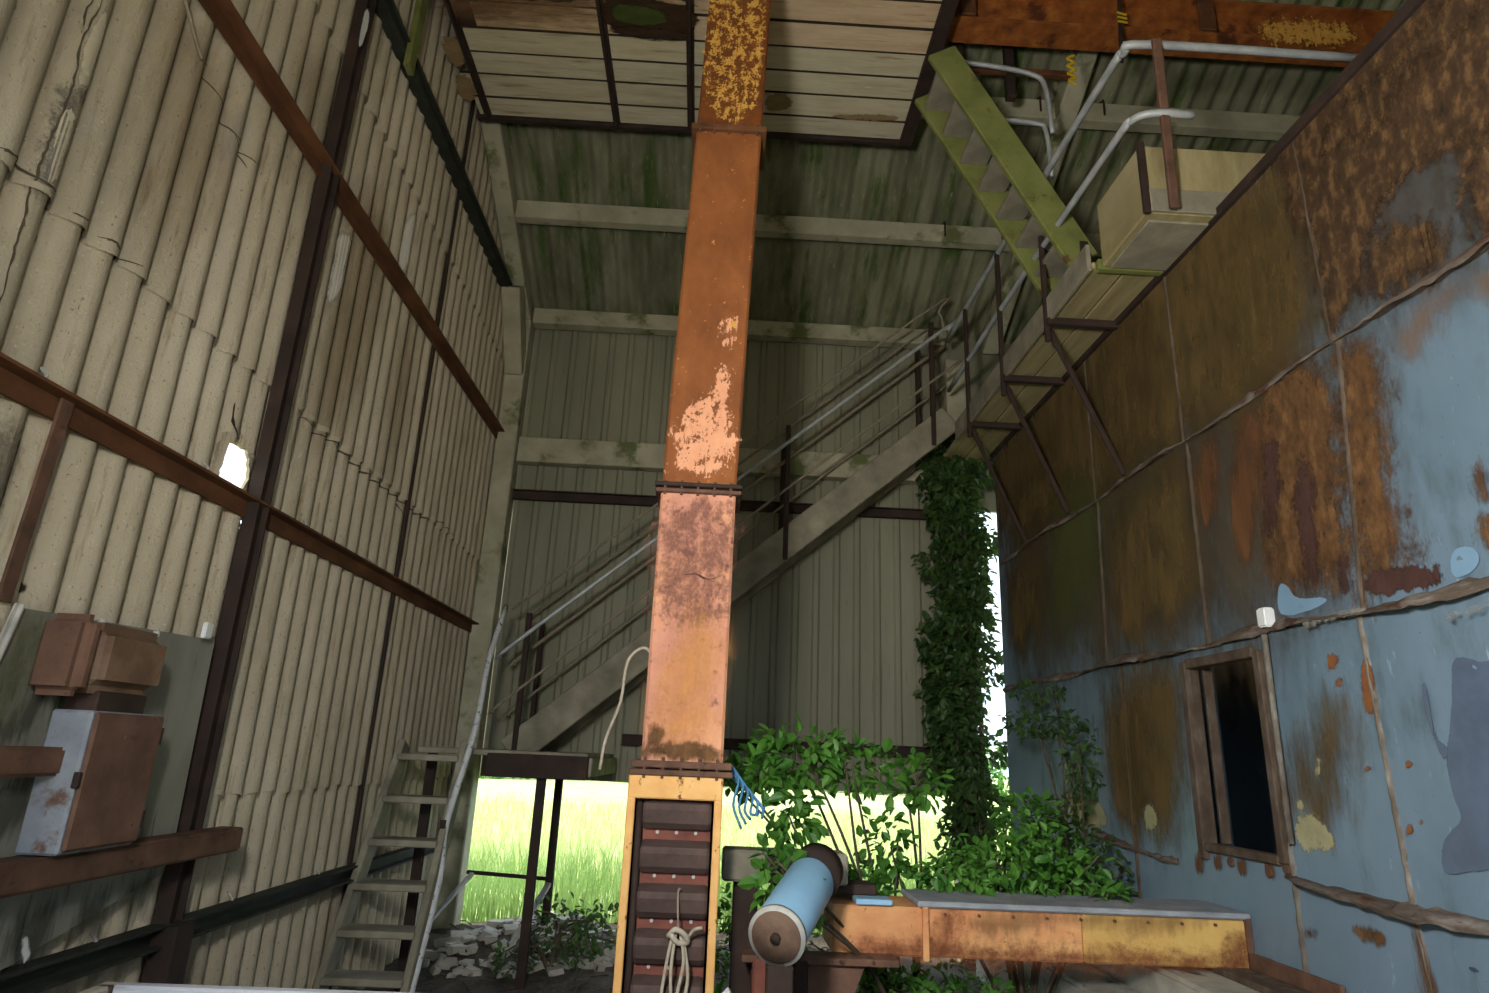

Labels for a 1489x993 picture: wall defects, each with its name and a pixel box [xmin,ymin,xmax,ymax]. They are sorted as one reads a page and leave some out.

crack [0,0,102,302]
peeling [664,316,742,478]
rust [652,497,735,628]
rust [641,725,723,762]